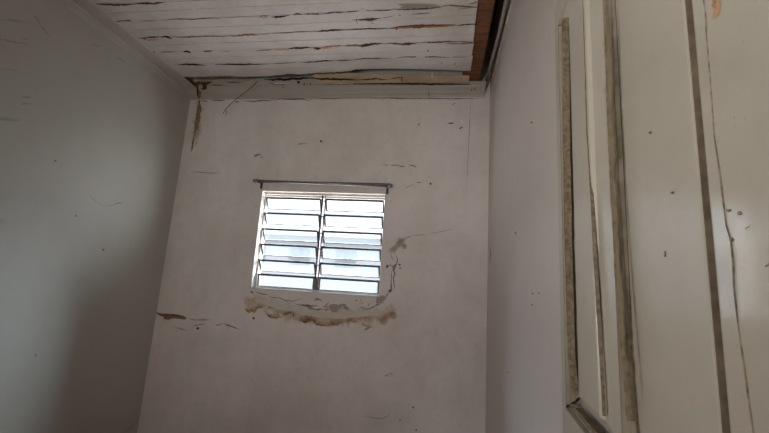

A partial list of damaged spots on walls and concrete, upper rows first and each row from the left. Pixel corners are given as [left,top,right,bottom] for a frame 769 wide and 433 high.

peeling [260,2,479,18]
crack [703,0,755,433]
crack [361,229,450,309]
flaking render [156,312,187,321]
water stain [246,306,356,326]